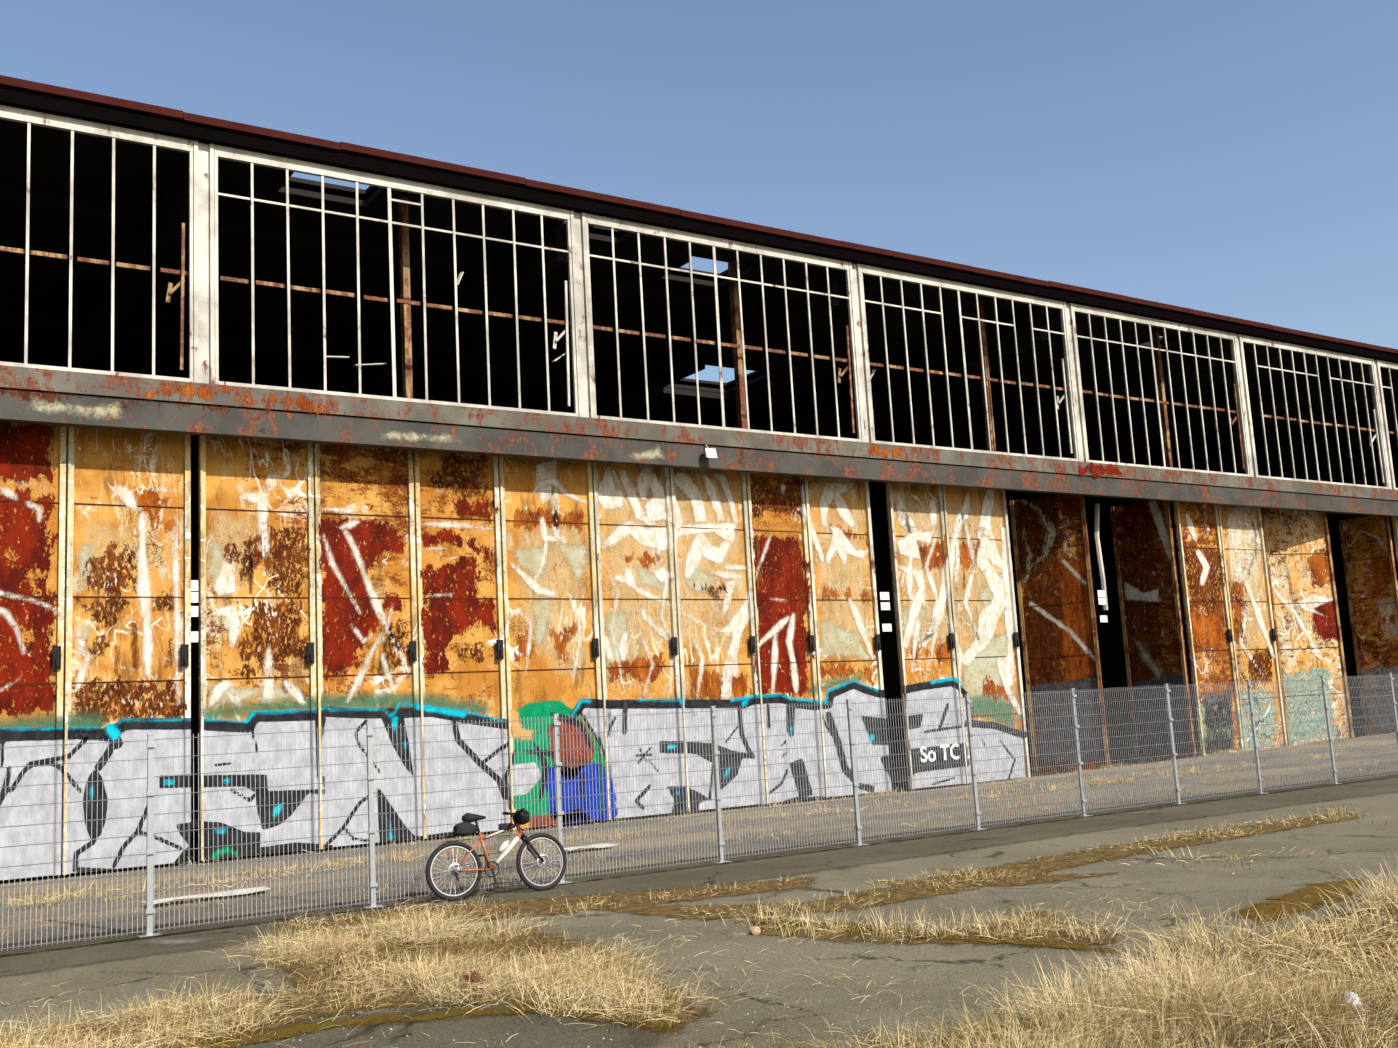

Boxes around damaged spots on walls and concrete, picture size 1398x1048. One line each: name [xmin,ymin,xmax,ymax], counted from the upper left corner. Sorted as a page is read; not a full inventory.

corrosion [0,388,100,407]
corrosion [121,382,326,433]
corrosion [0,422,190,732]
corrosion [224,452,584,693]
corrosion [626,549,671,568]
corrosion [689,447,875,700]
corrosion [918,515,980,588]
corrosion [608,652,665,684]
corrosion [911,640,954,664]
corrosion [983,675,1009,703]
corrosion [1004,496,1101,766]
corrosion [1116,501,1275,742]